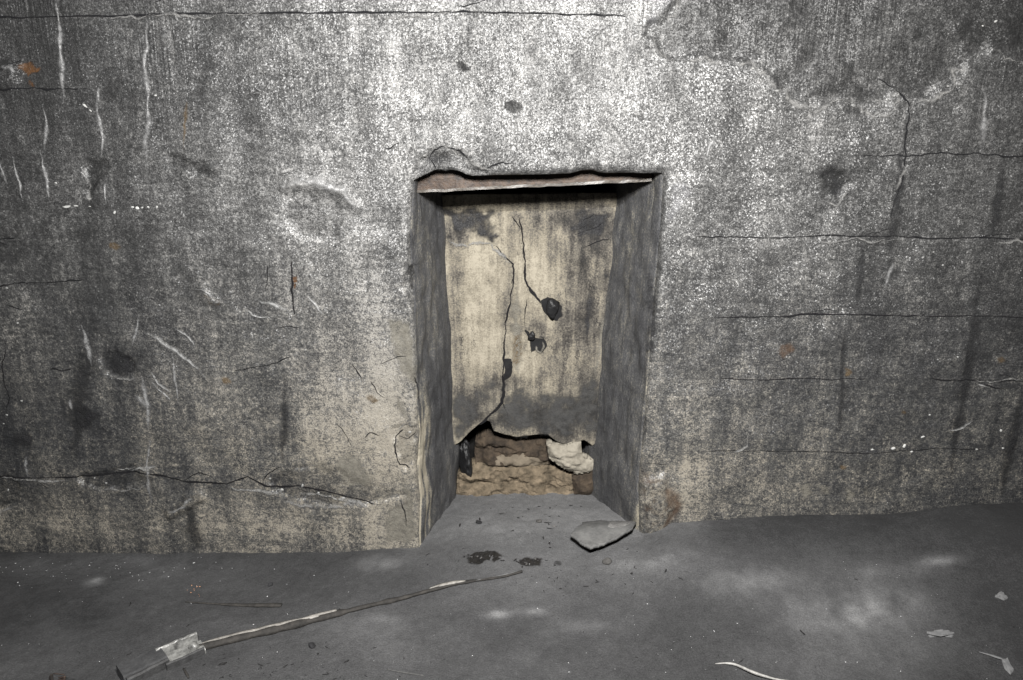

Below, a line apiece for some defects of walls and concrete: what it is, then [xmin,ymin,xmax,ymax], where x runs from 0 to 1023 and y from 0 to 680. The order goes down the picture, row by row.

crack [0,0,627,20]
crack [701,78,1023,244]
crack [454,216,541,425]
crack [718,309,1023,318]
crack [337,424,416,468]
spalling [456,424,594,497]
crack [0,467,374,505]